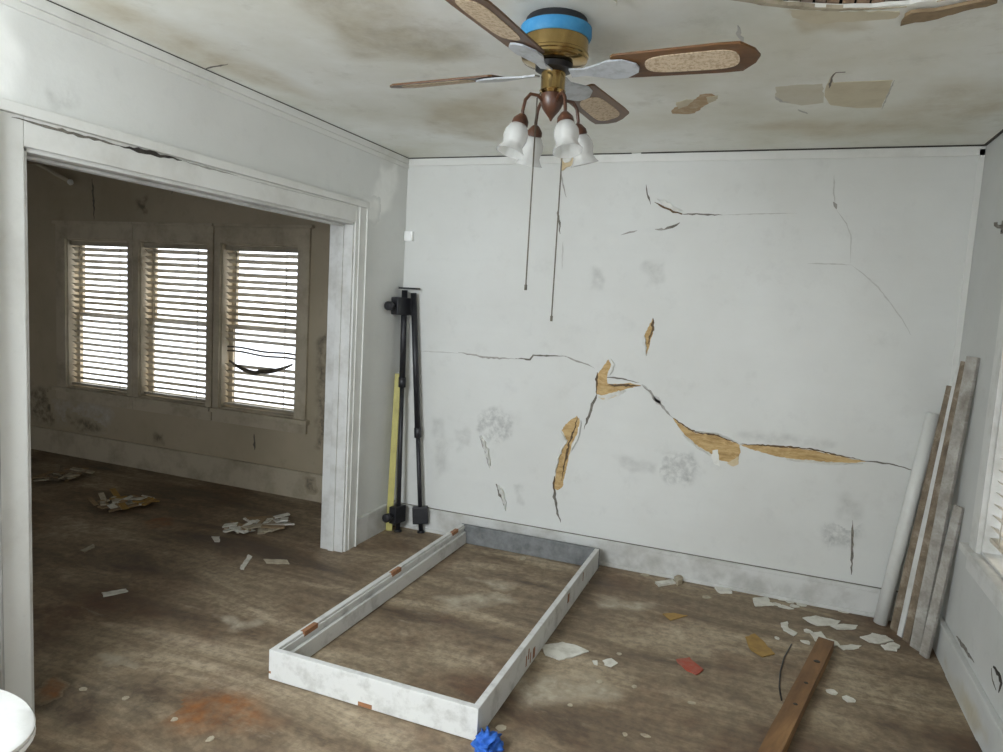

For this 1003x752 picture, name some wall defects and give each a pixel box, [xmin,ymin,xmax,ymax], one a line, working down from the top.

flaking render [733,0,998,26]
leakage [271,0,505,69]
peeling [671,94,718,114]
peeling [775,72,895,114]
crack [13,117,340,203]
crack [622,186,786,235]
crack [808,180,911,335]
flaking render [642,318,654,354]
crack [423,351,592,367]
crack [642,384,673,418]
flaking render [553,359,641,522]